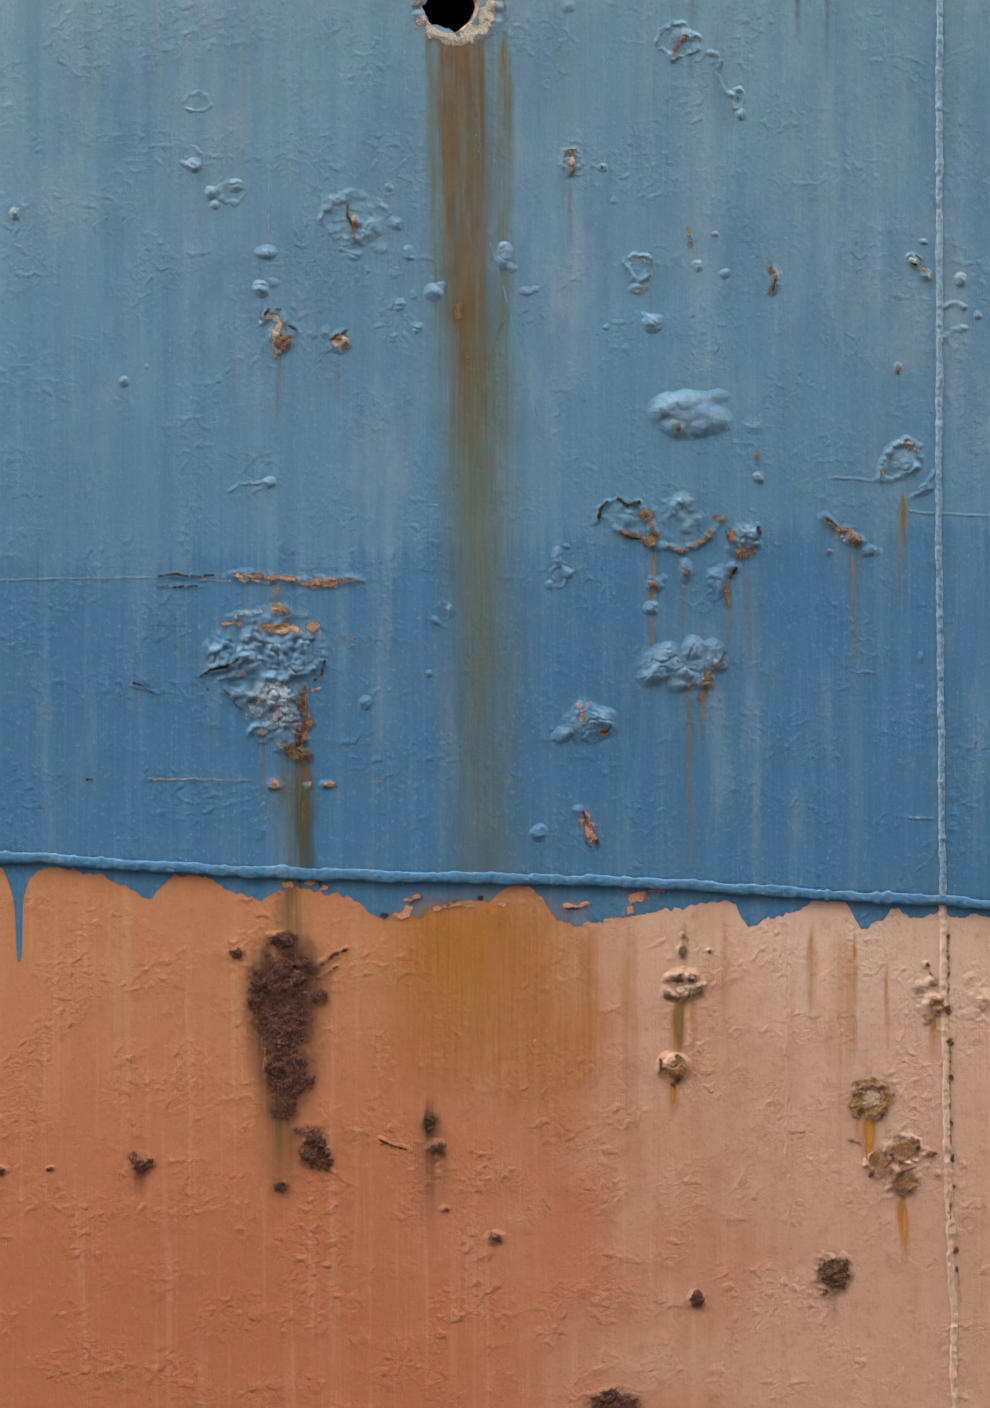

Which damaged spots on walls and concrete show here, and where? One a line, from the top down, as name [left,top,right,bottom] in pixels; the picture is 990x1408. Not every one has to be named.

peeling [412,0,511,48]
corrosion [816,510,883,558]
corrosion [641,557,693,616]
peeling [282,880,328,891]
peeling [380,883,510,920]
peeling [562,901,590,910]
peeling [626,890,666,914]
corrosion [908,934,951,1031]
corrosion [654,1050,693,1105]
corrosion [946,1038,954,1137]
corrosion [848,1075,956,1246]
corrosion [809,1248,857,1299]